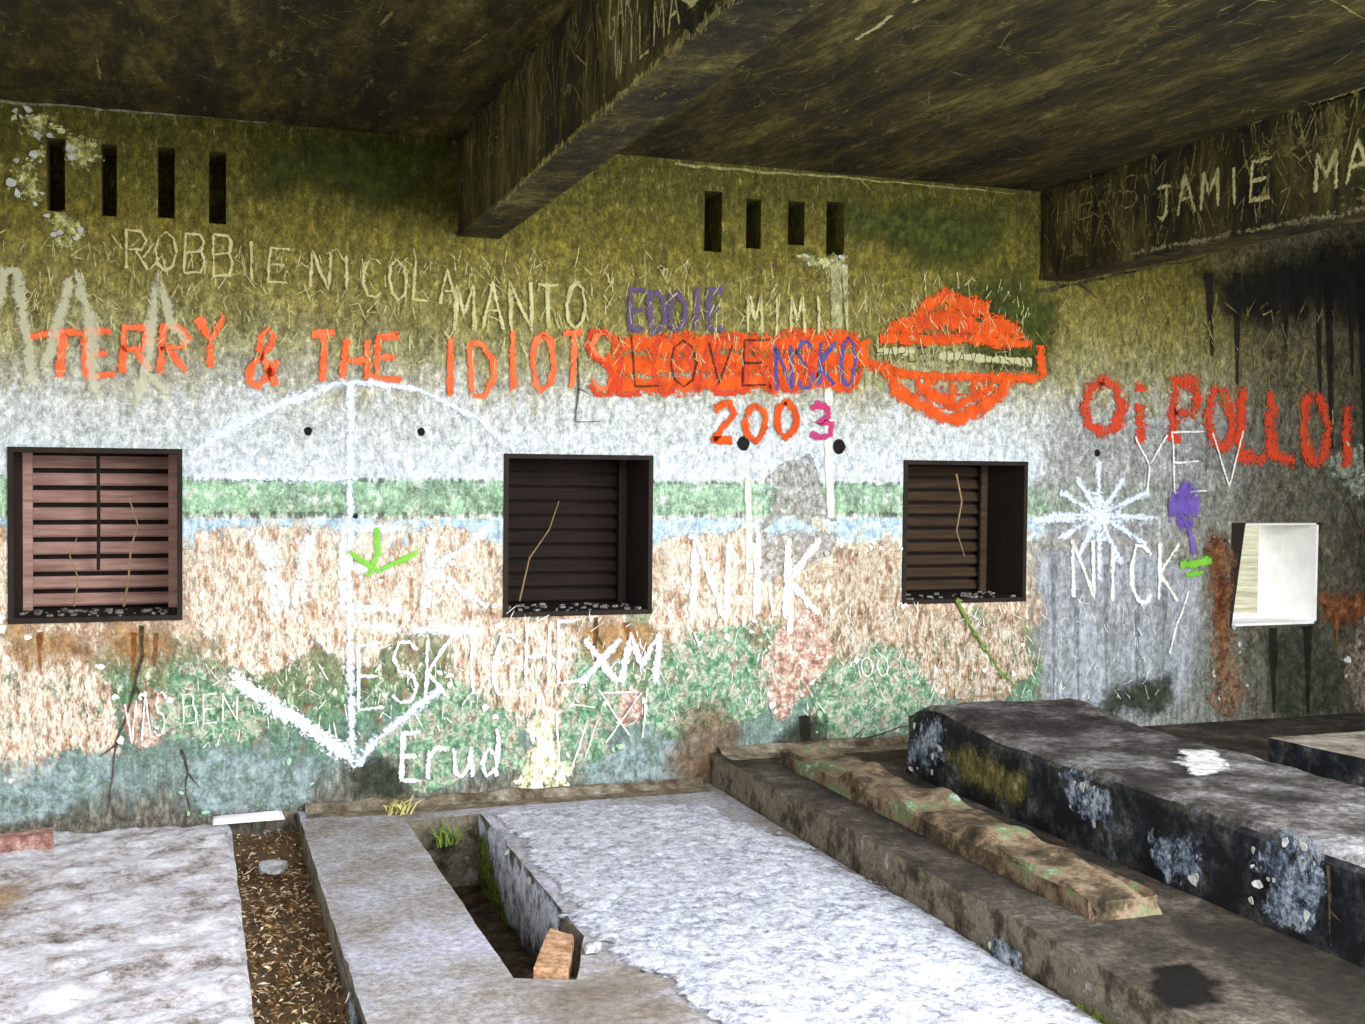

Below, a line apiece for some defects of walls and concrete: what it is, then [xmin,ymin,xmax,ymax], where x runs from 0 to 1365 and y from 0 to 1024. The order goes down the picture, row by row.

water stain [1204,273,1214,356]
water stain [1233,272,1241,387]
water stain [1313,260,1365,472]
rust [1207,540,1231,680]
crack [99,625,152,815]
crack [180,749,200,815]